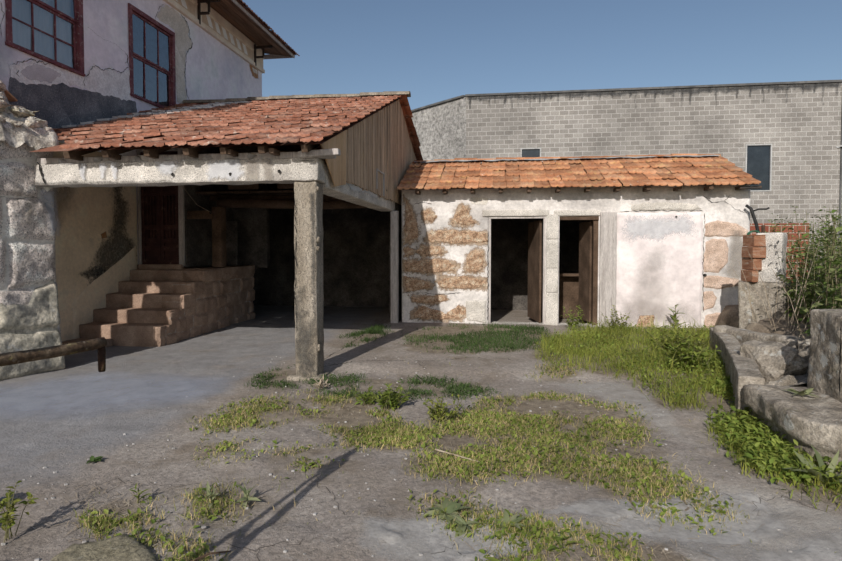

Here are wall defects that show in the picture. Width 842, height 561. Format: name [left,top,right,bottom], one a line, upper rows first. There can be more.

flaking render [8,58,137,131]
flaking render [155,5,193,105]